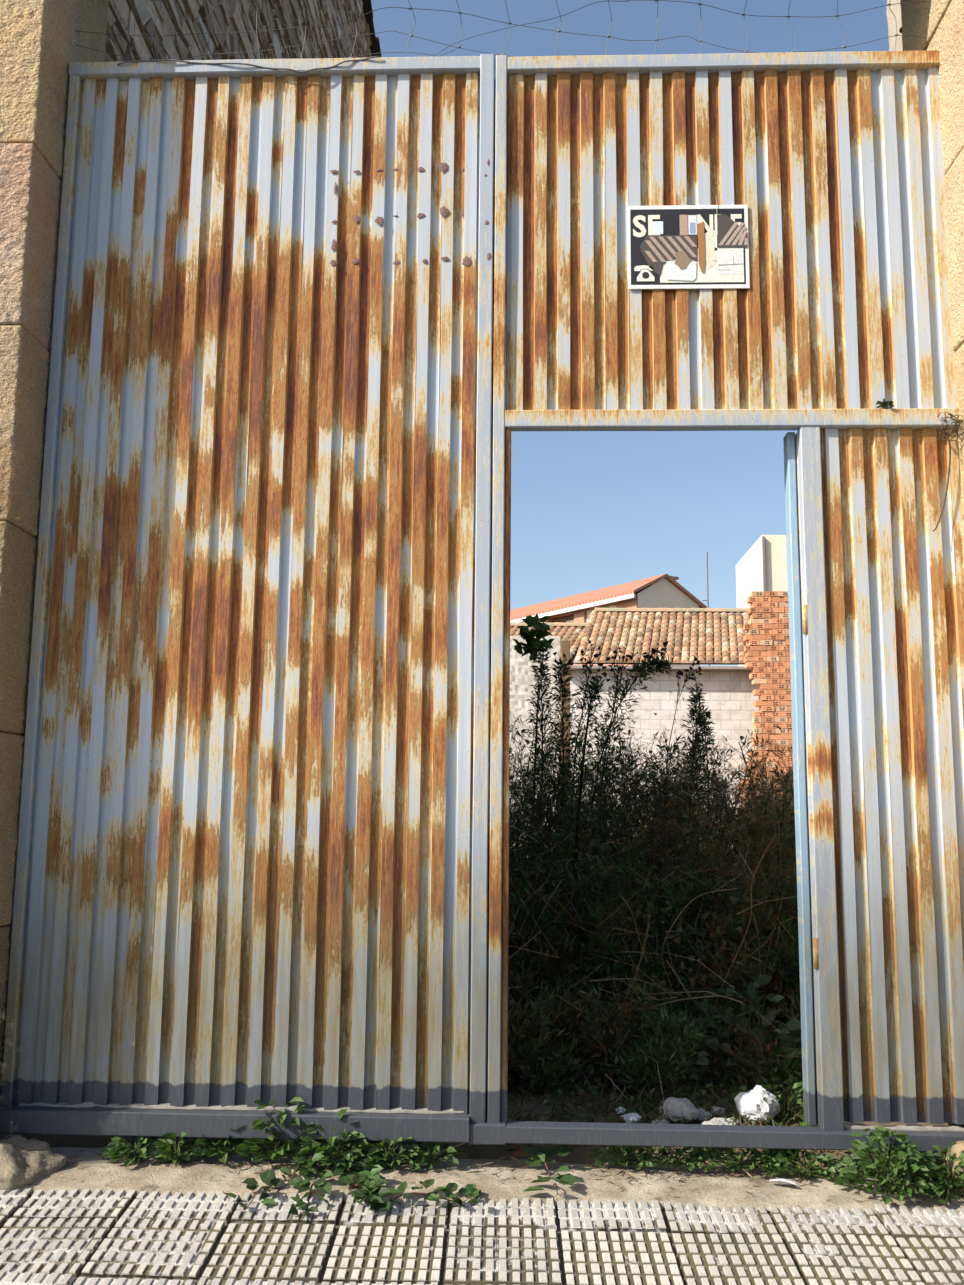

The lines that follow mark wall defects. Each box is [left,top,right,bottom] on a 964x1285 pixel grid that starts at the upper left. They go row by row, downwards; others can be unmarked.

rust [512,77,893,402]
rust [907,79,919,112]
rust [45,83,477,1099]
rust [821,440,964,781]
rust [831,742,874,1107]
rust [882,823,933,990]
rust [912,1005,927,1108]
rust [942,1069,954,1108]